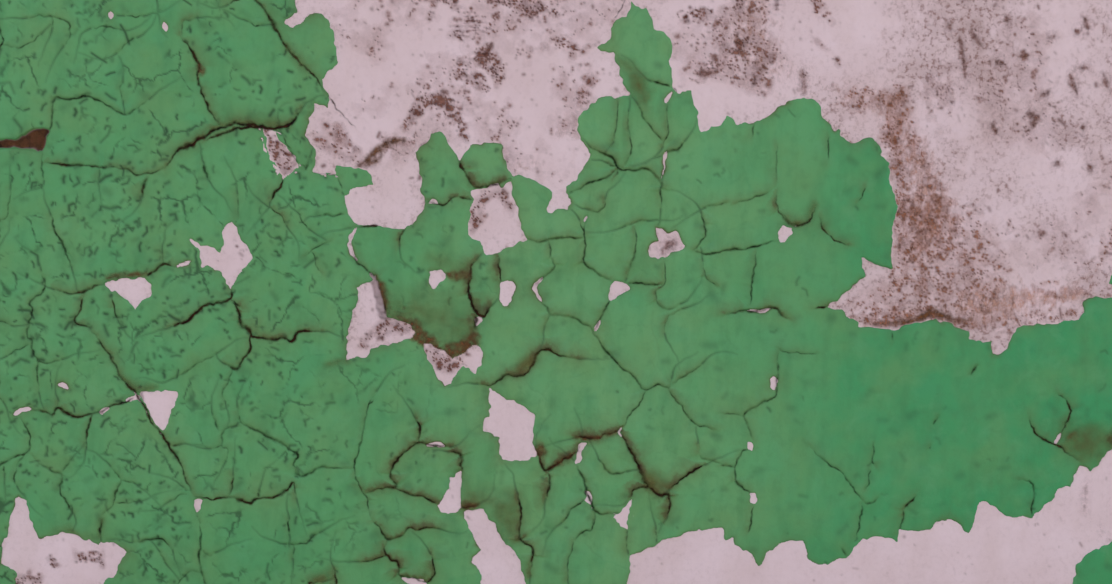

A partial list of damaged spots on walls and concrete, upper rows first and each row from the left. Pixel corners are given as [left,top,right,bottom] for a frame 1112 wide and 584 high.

crack [131,41,297,193]
peeling [177,222,253,289]
crack [467,264,501,328]
peeling [259,0,1112,355]
corrosion [841,85,1077,333]
peeling [1,497,126,584]
crack [2,285,312,505]
crack [354,422,463,582]
peeling [438,471,526,584]
peeling [483,388,537,461]
crack [538,384,702,534]
peeling [627,450,1112,584]